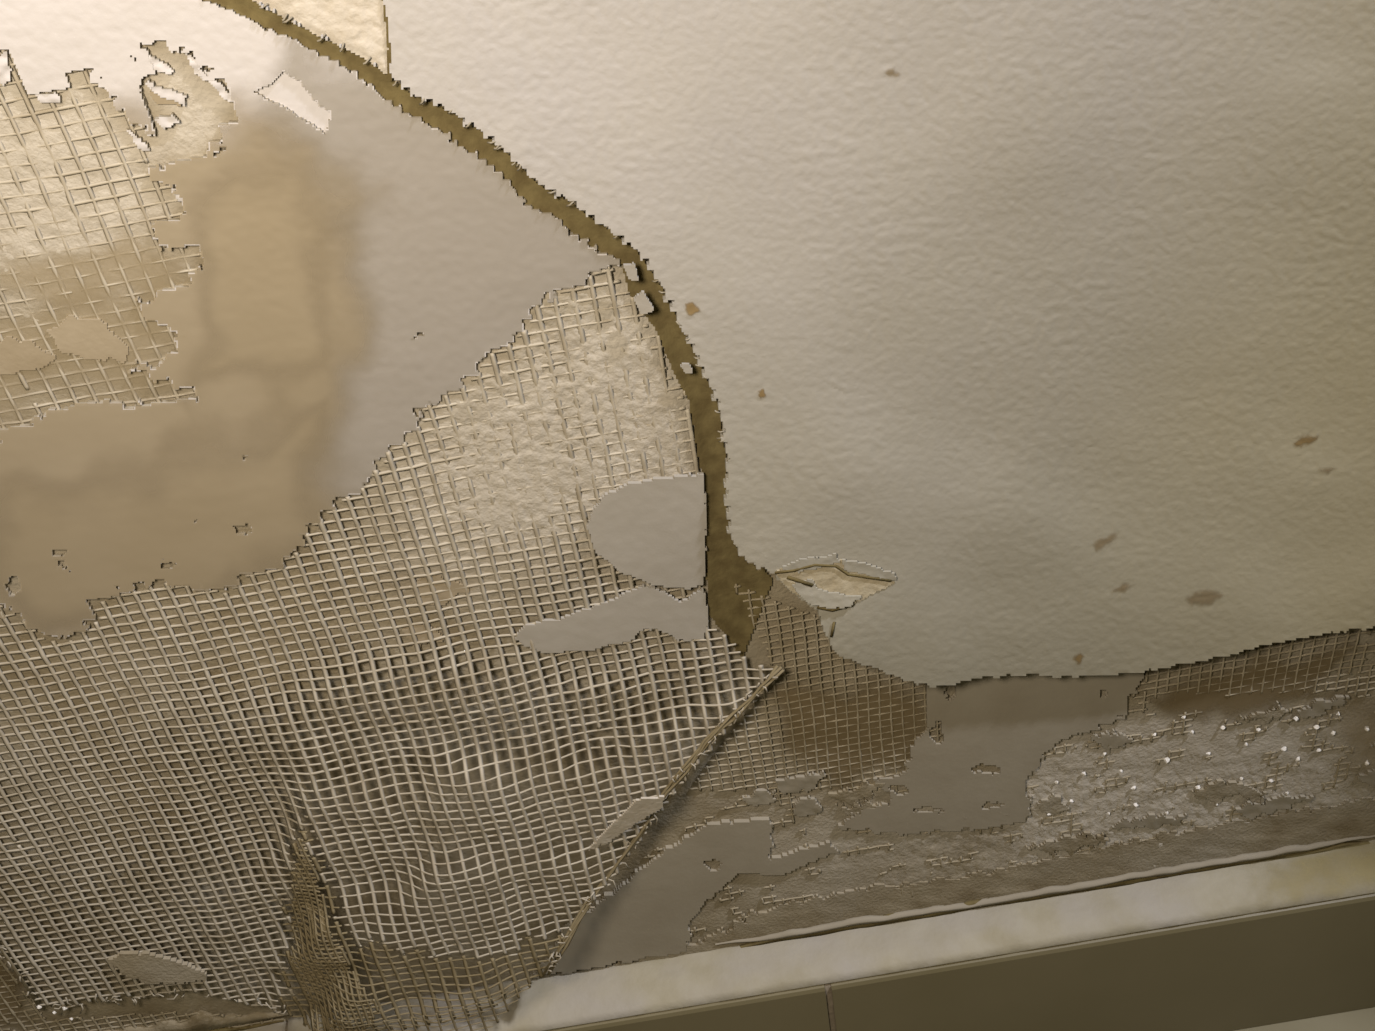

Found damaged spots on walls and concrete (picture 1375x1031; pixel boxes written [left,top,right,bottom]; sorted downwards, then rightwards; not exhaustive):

flaking render [0,0,619,304]
flaking render [0,314,199,443]
crack [203,0,772,656]
flaking render [411,575,469,605]
flaking render [586,472,707,590]
peeling [775,553,896,637]
flaking render [531,673,1375,978]
flaking render [108,950,207,984]